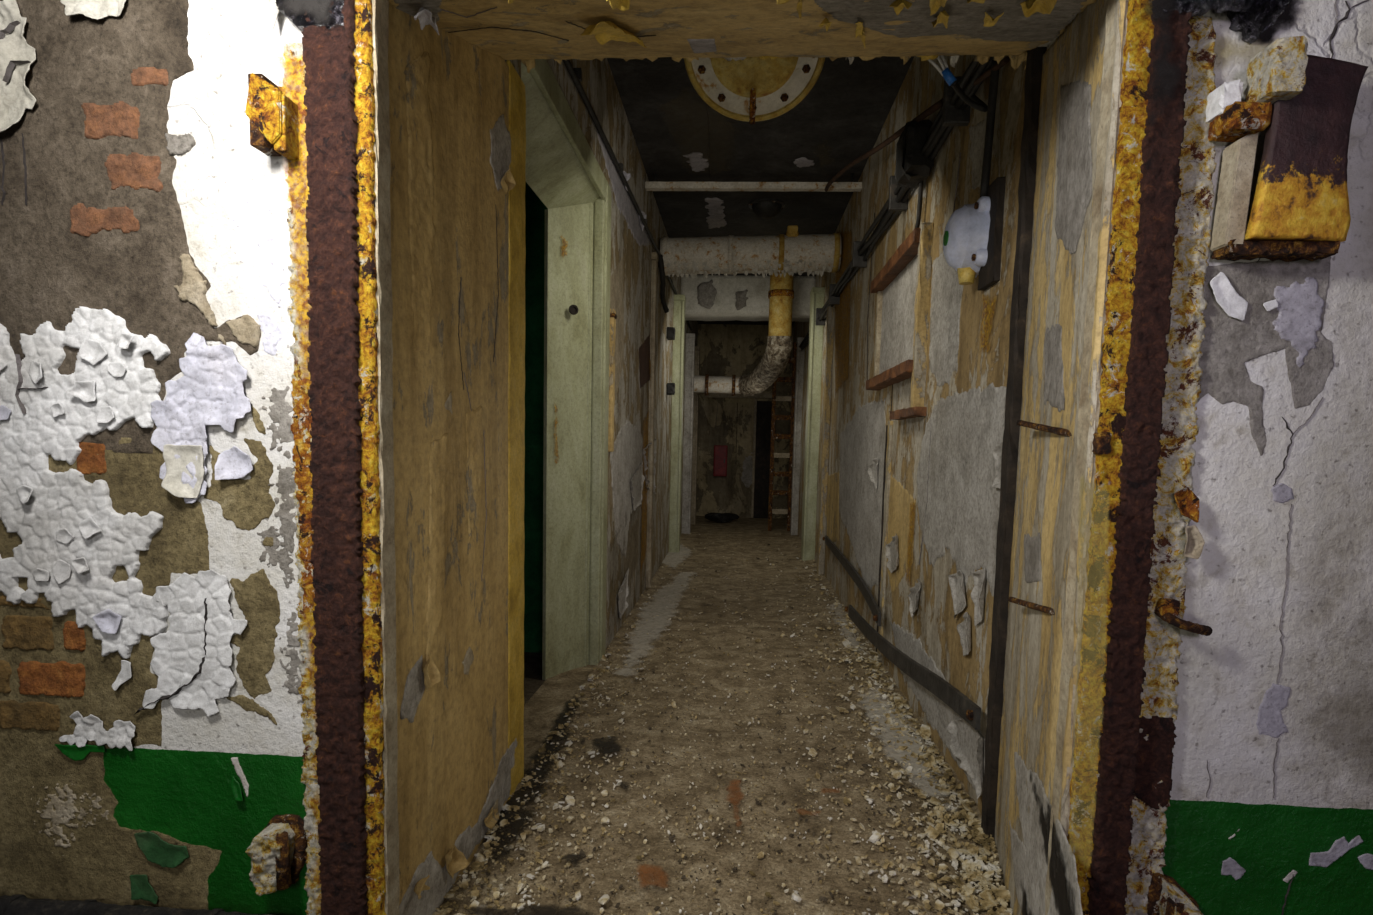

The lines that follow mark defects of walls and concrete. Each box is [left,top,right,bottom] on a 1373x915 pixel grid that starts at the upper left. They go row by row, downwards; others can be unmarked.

crack [1329,0,1369,58]
flaking render [0,0,261,401]
flaking render [0,519,22,559]
flaking render [48,386,304,725]
rust [278,55,318,770]
rust [640,411,649,574]
rust [835,230,852,393]
rust [1174,487,1205,559]
peeling [1195,256,1334,456]
flaking render [0,577,222,910]
rust [1134,716,1177,810]
peeling [1283,835,1373,883]